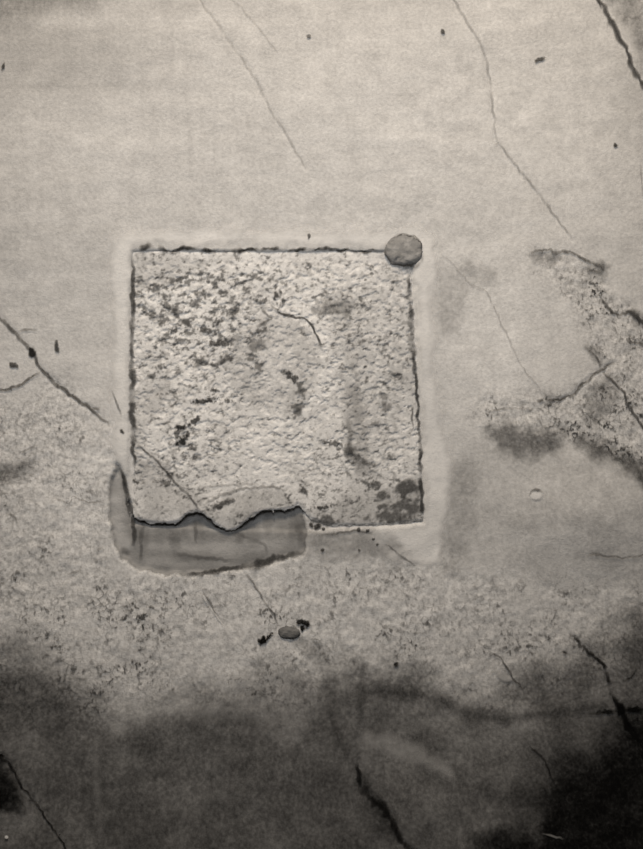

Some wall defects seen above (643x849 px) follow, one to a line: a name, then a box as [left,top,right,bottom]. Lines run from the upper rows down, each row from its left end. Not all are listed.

crack [597,0,643,87]
crack [0,318,107,422]
spalling [550,375,643,464]
spalling [109,465,339,576]
peeling [363,479,423,523]
spalling [79,656,153,712]
crack [574,636,643,748]
crack [0,754,66,849]
crack [356,766,409,849]